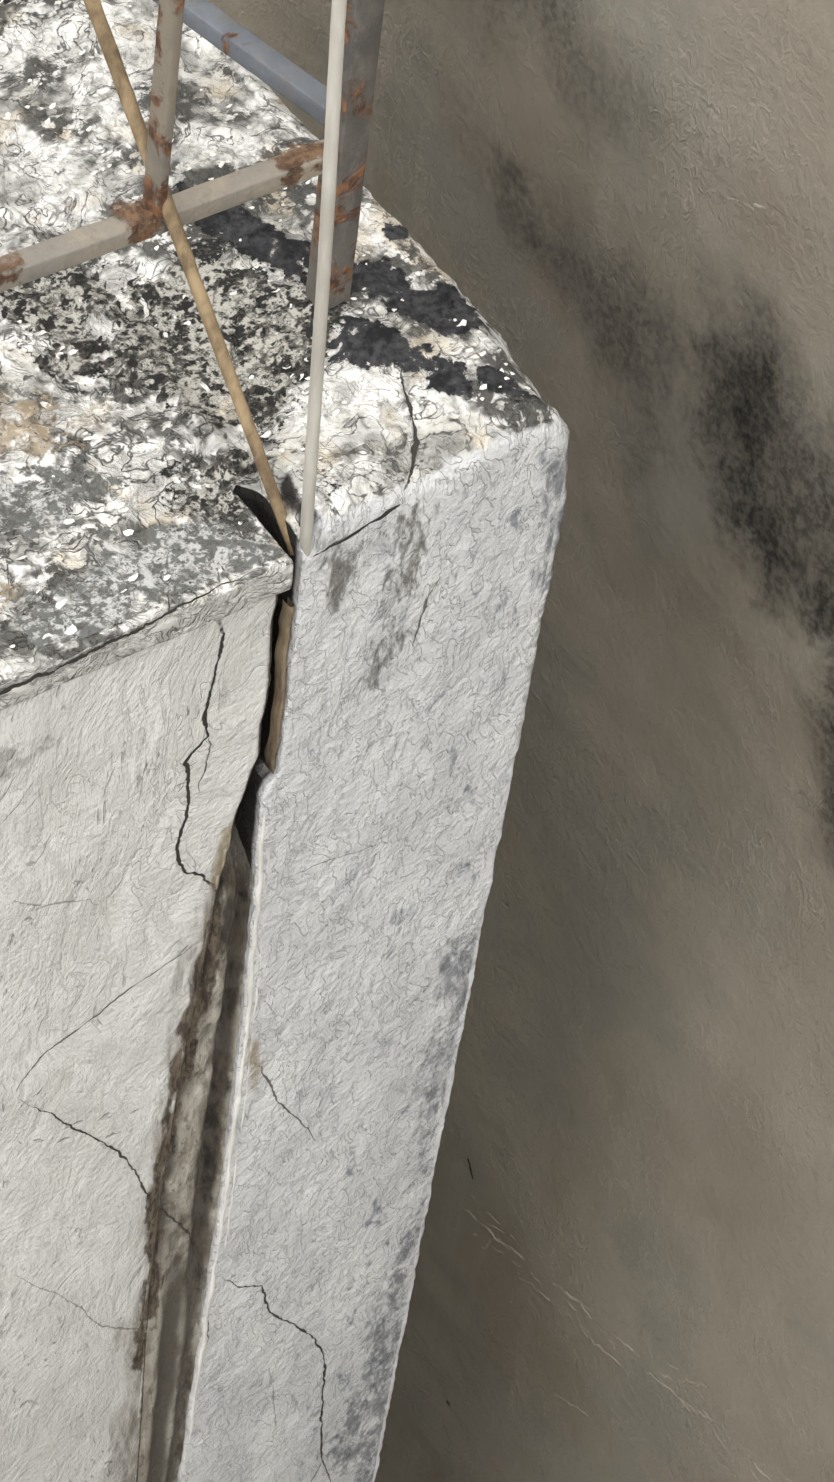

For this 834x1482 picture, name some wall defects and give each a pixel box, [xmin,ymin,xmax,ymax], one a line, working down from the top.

corrosion [262,142,340,188]
corrosion [110,200,162,246]
corrosion [0,251,24,286]
crack [315,366,420,556]
crack [412,581,438,646]
crack [16,947,194,1245]
leakage [132,862,248,1388]
crack [254,1063,313,1138]
leakage [182,1360,192,1418]
crack [229,1280,331,1482]
leakage [175,1436,184,1463]